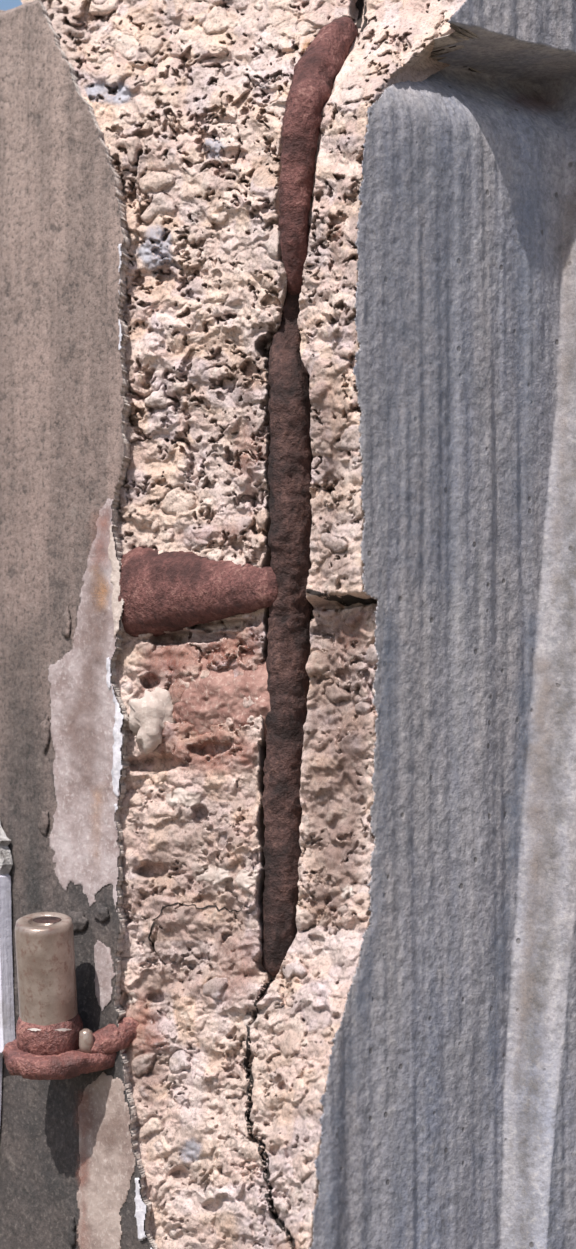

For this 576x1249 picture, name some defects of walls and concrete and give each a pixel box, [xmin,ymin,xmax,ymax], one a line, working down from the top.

spalling [20,0,466,1249]
rust [149,17,360,977]
crack [243,979,295,1249]